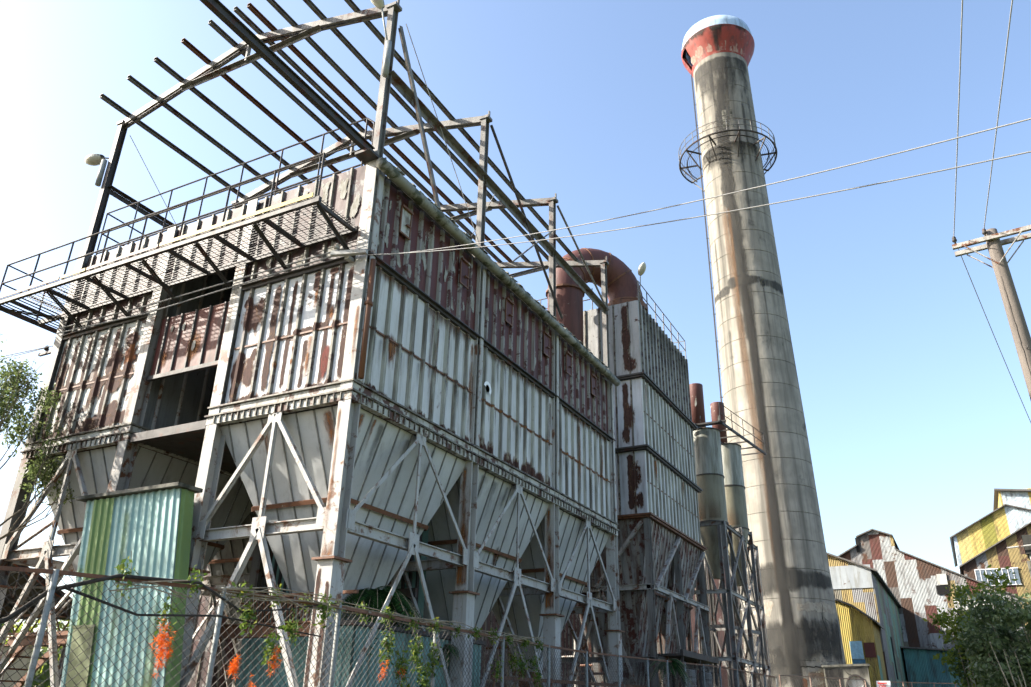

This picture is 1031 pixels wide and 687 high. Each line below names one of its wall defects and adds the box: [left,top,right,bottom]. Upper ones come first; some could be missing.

corrosion [304,336,329,380]
corrosion [371,307,551,443]
water stain [682,24,867,687]